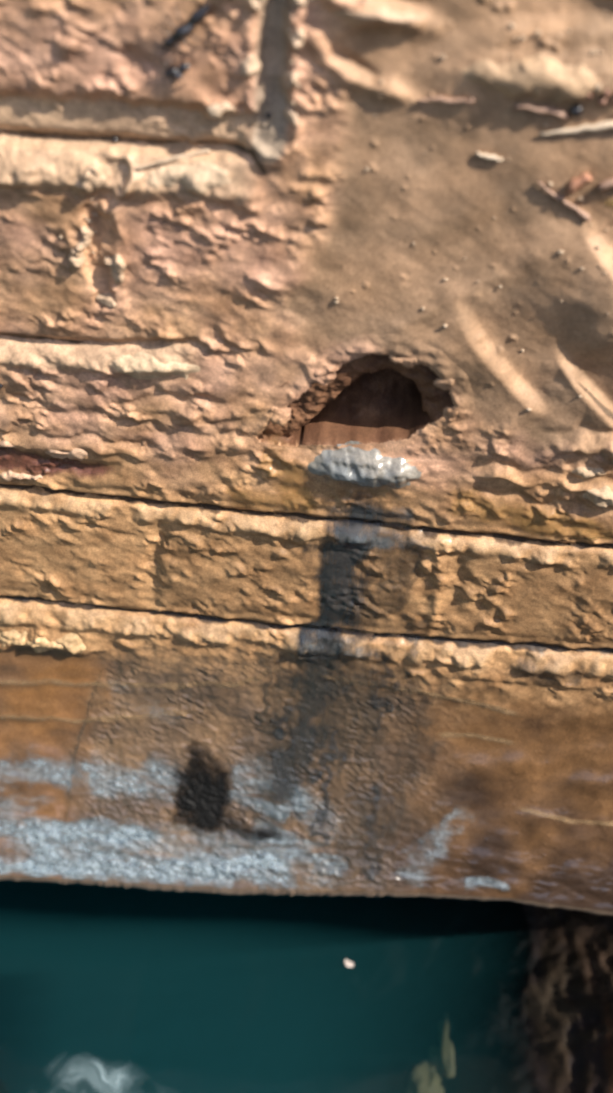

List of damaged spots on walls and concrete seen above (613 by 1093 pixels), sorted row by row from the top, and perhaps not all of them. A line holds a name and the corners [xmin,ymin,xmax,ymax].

spalling [256,354,458,448]
leakage [272,494,512,843]
leakage [0,744,291,883]